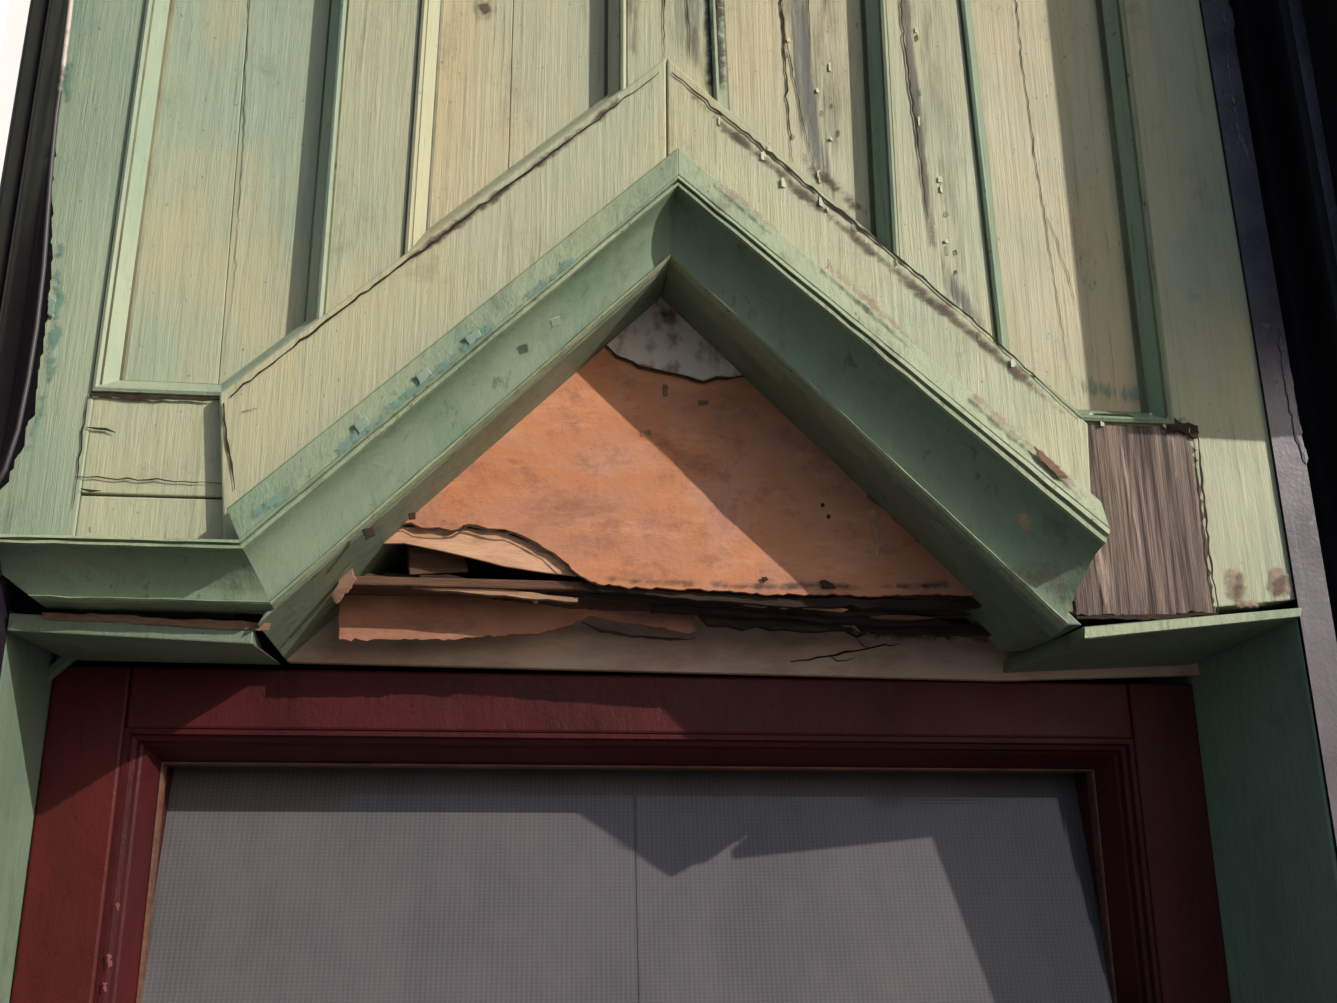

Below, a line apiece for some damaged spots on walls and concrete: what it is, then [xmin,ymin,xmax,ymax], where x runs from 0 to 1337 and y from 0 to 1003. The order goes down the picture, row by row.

crack [1015,0,1078,393]
peeling [337,324,494,456]
peeling [362,526,375,540]
peeling [973,394,1258,621]
peeling [331,552,697,642]
peeling [1269,568,1293,595]
crack [790,632,900,662]